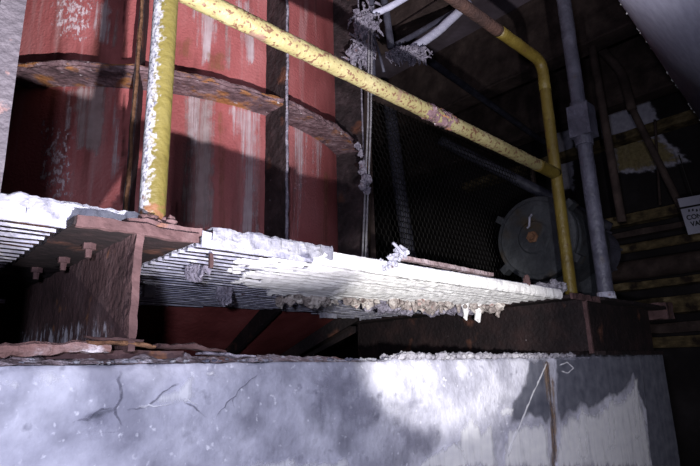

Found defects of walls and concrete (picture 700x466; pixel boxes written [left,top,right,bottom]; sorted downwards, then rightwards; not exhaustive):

damp [182,97,563,323]
damp [501,355,680,466]